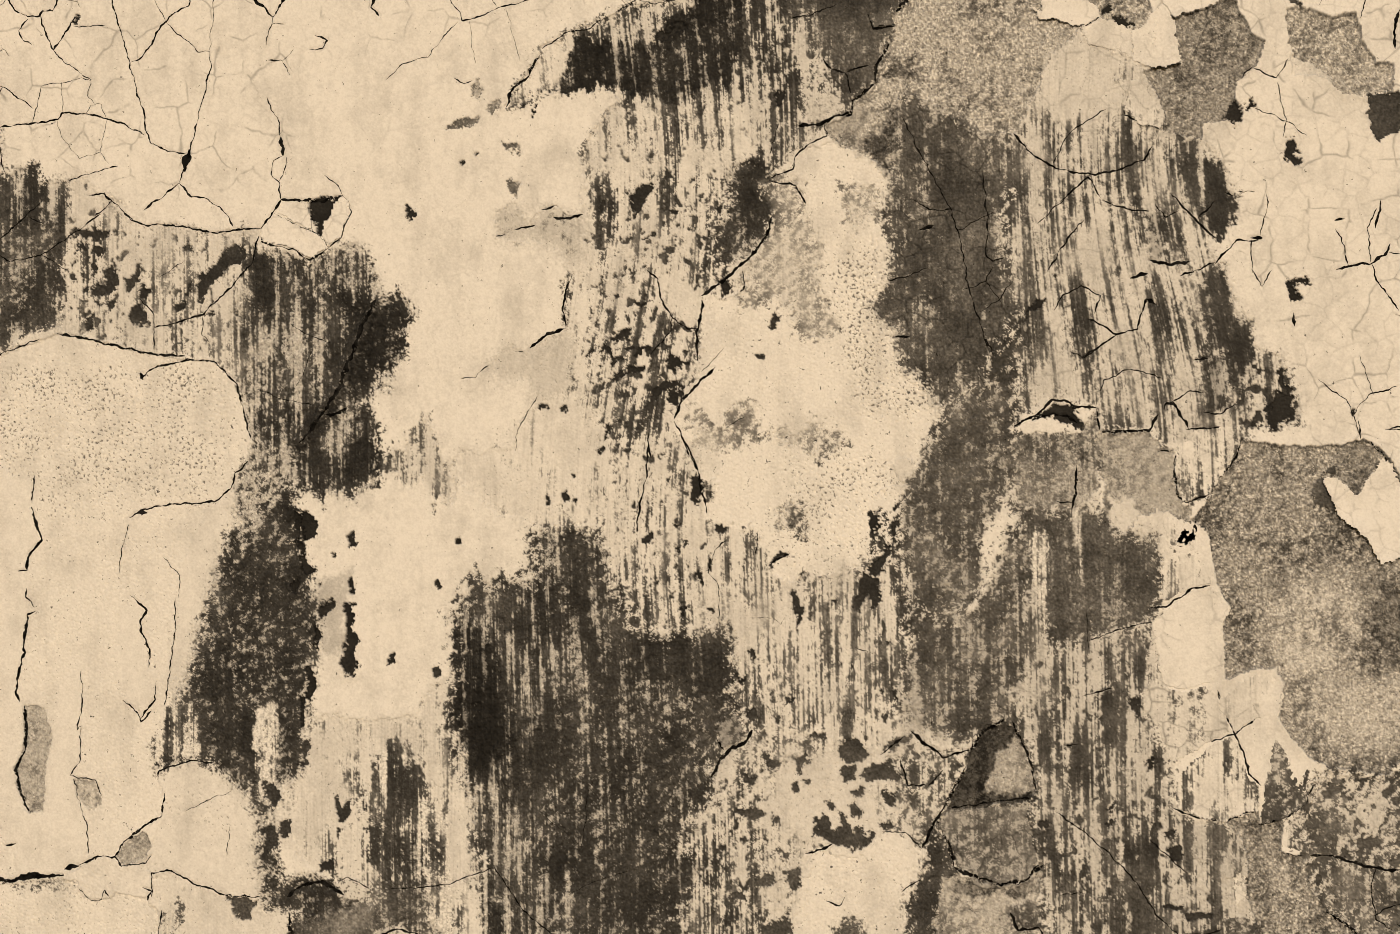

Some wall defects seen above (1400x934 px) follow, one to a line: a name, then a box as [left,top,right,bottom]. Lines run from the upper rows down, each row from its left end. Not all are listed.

crack [387,0,674,107]
crack [1360,0,1400,48]
crack [13,477,43,811]
crack [0,0,376,722]
peeling [0,163,968,934]
crack [519,276,572,352]
crack [636,216,772,532]
peeling [445,0,1400,934]
crack [769,0,1272,934]
crack [1319,357,1400,477]
crack [1335,200,1399,310]
crack [0,673,554,934]